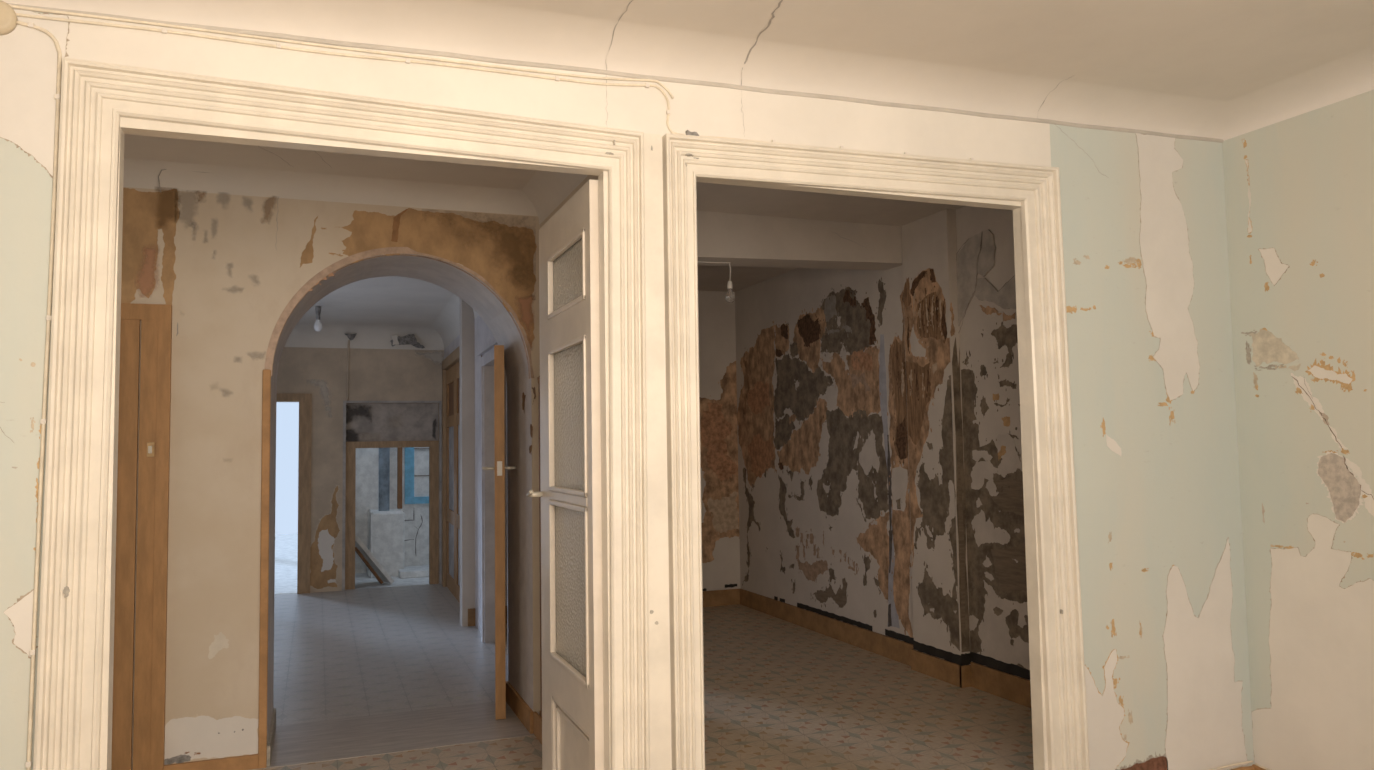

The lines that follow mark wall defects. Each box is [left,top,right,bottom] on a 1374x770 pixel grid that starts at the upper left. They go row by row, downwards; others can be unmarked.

peeling [0,9,70,178]
crack [741,0,783,137]
peeling [121,188,180,305]
peeling [300,208,537,349]
peeling [1105,133,1200,425]
peeling [1241,328,1367,410]
flaking render [700,230,1030,670]
crack [1291,373,1374,517]
peeling [1121,451,1374,770]